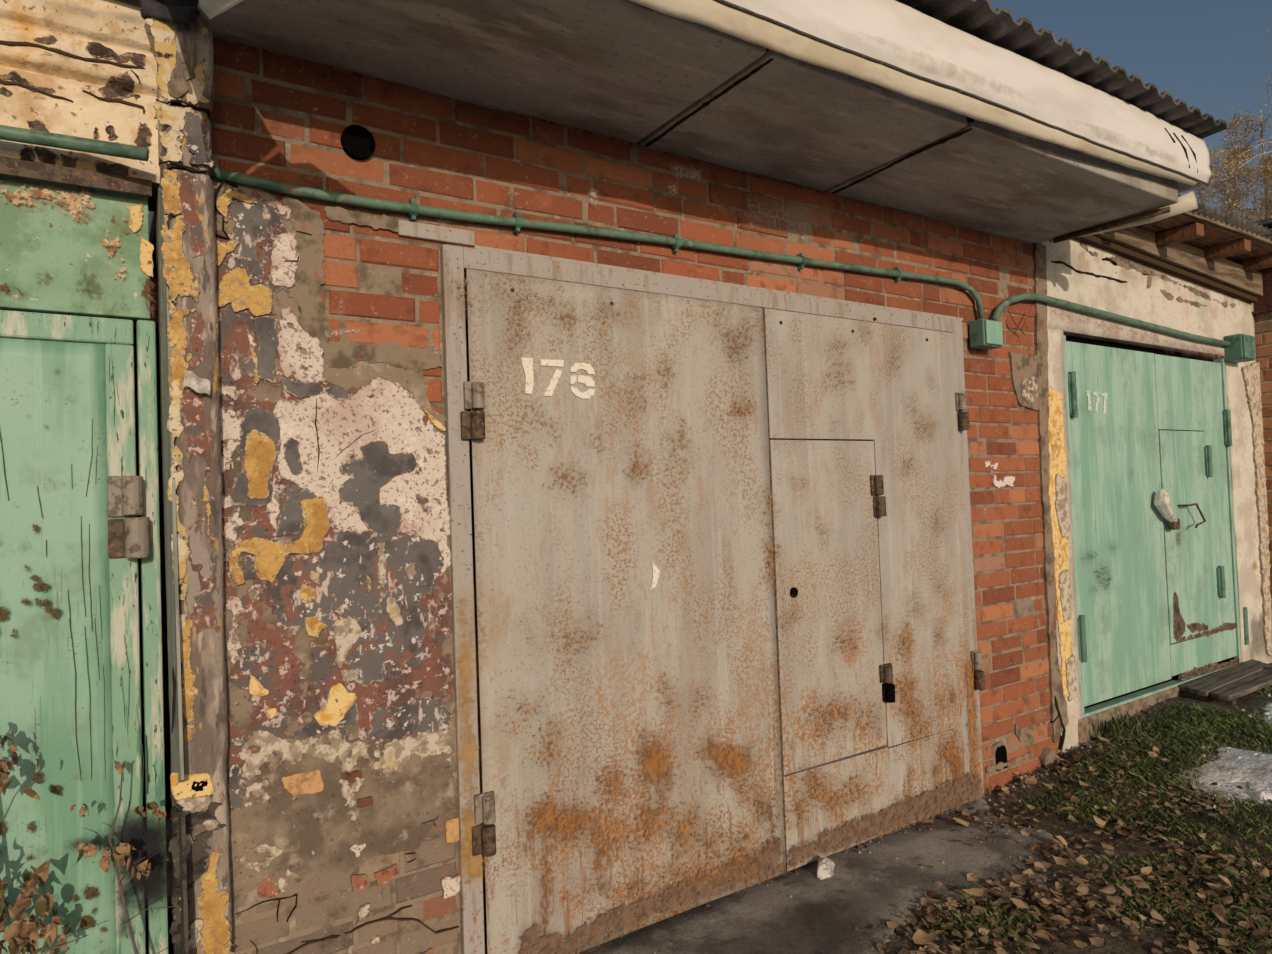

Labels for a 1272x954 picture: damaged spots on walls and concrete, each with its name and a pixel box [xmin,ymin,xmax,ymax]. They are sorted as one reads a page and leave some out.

spalling [0,71,56,96]
spalling [7,146,78,168]
peeling [0,180,96,229]
rust [447,258,651,356]
peeling [85,17,456,954]
rust [543,417,608,514]
rust [618,352,698,512]
peeling [1047,385,1078,701]
rust [1173,592,1237,642]
rust [493,569,984,954]
crack [235,894,459,954]
spalling [440,874,461,899]